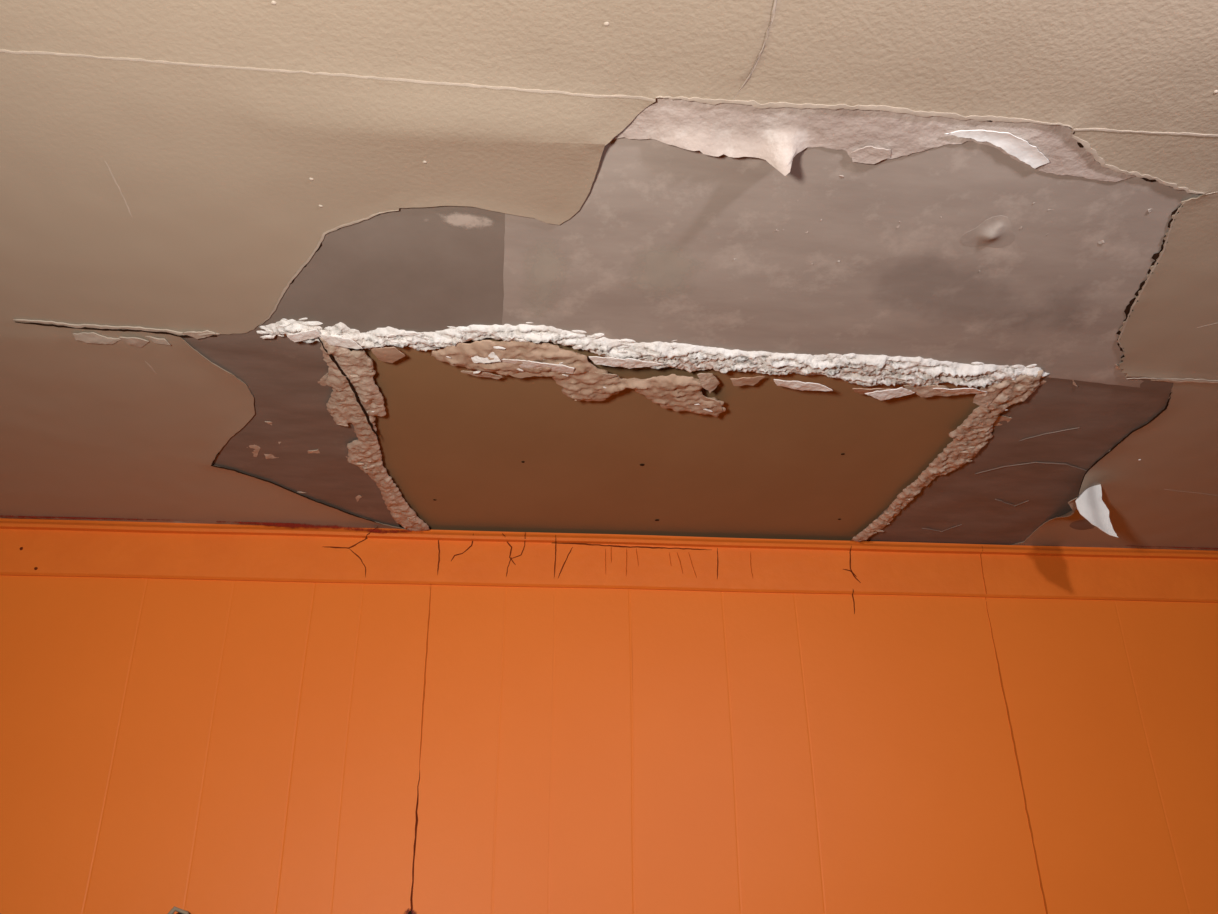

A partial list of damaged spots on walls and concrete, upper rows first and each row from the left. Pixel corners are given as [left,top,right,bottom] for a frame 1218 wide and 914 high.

crack [1072,128,1218,137]
peeling [181,96,1205,545]
crack [330,528,376,577]
crack [554,535,718,578]
crack [844,546,861,614]
crack [410,533,526,911]